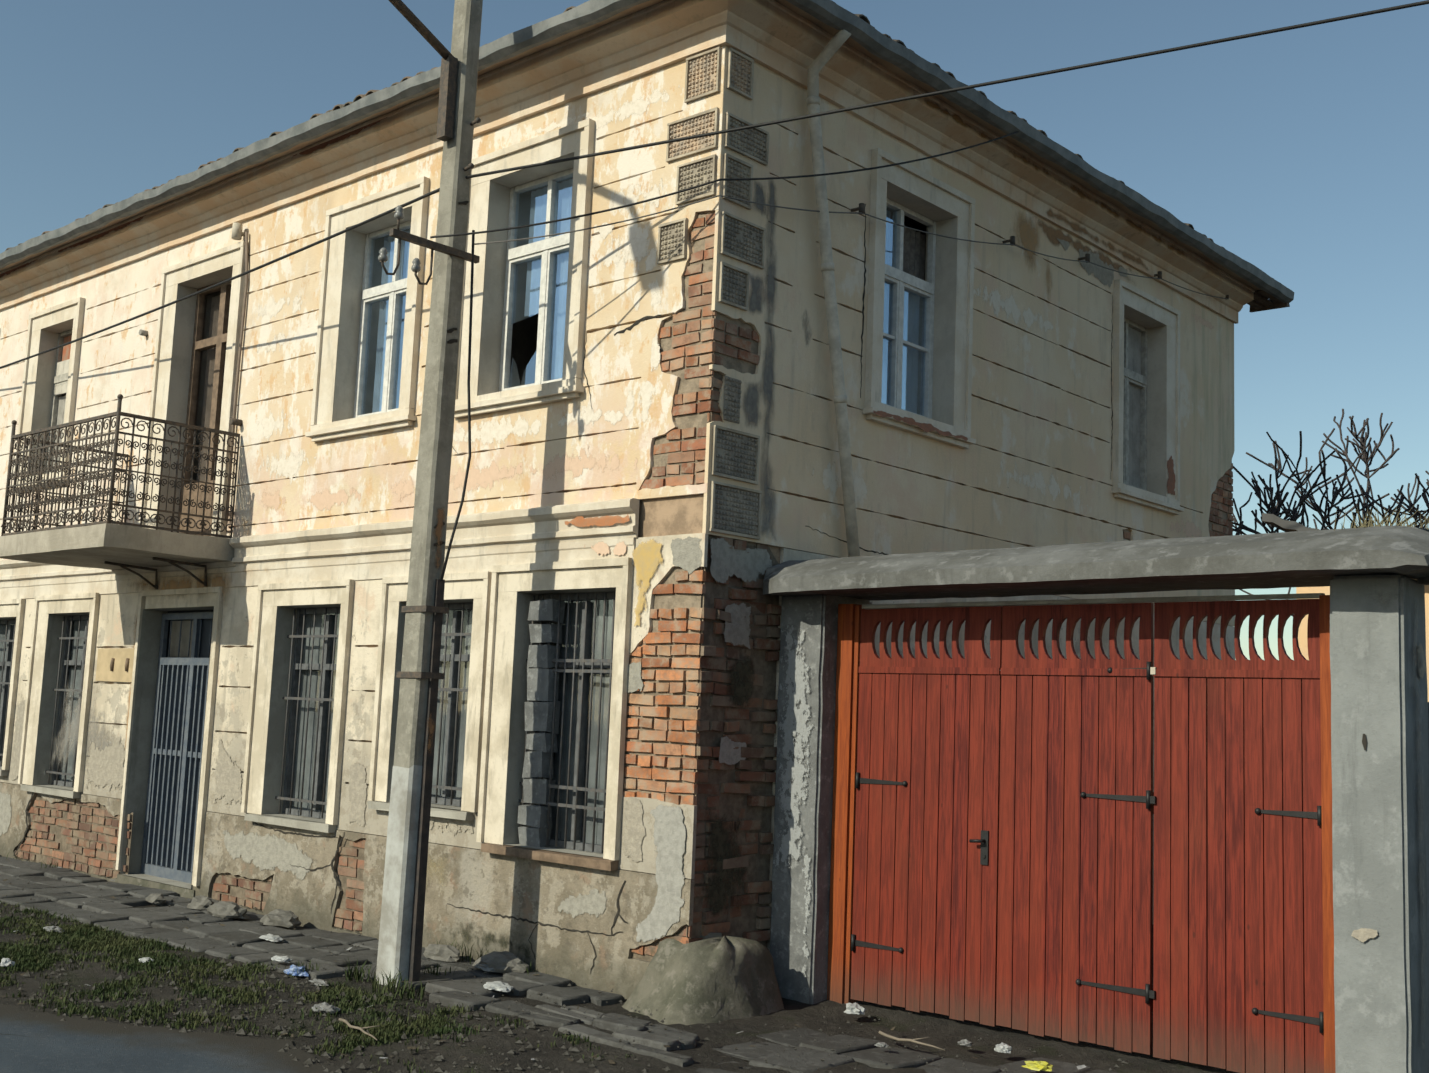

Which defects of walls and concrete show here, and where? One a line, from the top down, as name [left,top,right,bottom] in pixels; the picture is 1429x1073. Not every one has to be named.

flaking render [450,178,760,492]
spalling [1057,238,1127,287]
flaking render [1170,462,1234,538]
flaking render [0,700,133,879]
spalling [211,830,313,911]
flaking render [334,762,367,933]
crack [447,881,628,974]
flaking render [565,514,782,962]